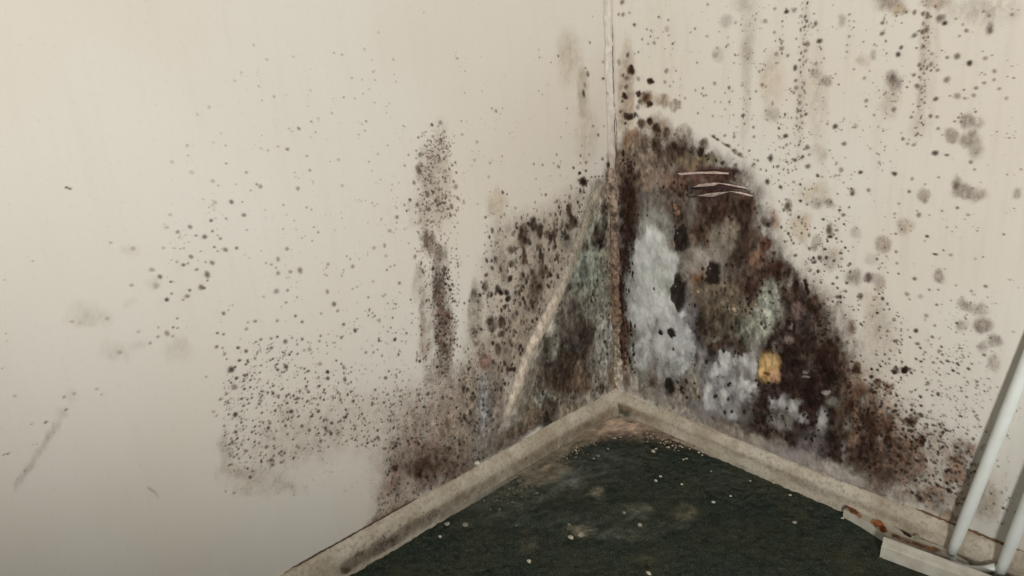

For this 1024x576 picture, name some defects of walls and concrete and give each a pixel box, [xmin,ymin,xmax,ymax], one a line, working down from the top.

leakage [215,0,1001,522]
leakage [341,473,503,574]